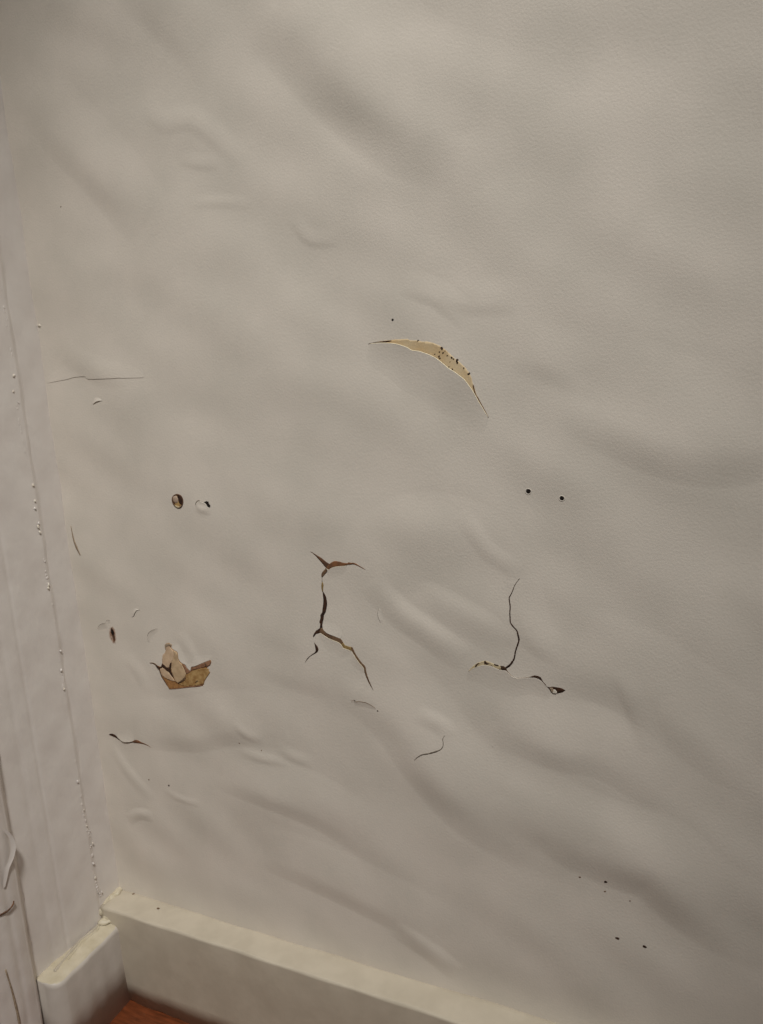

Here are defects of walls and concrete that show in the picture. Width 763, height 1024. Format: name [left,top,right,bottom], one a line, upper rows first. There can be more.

peeling [366,339,488,434]
peeling [152,643,212,689]
crack [305,552,378,711]
crack [467,579,565,699]
crack [109,727,150,747]